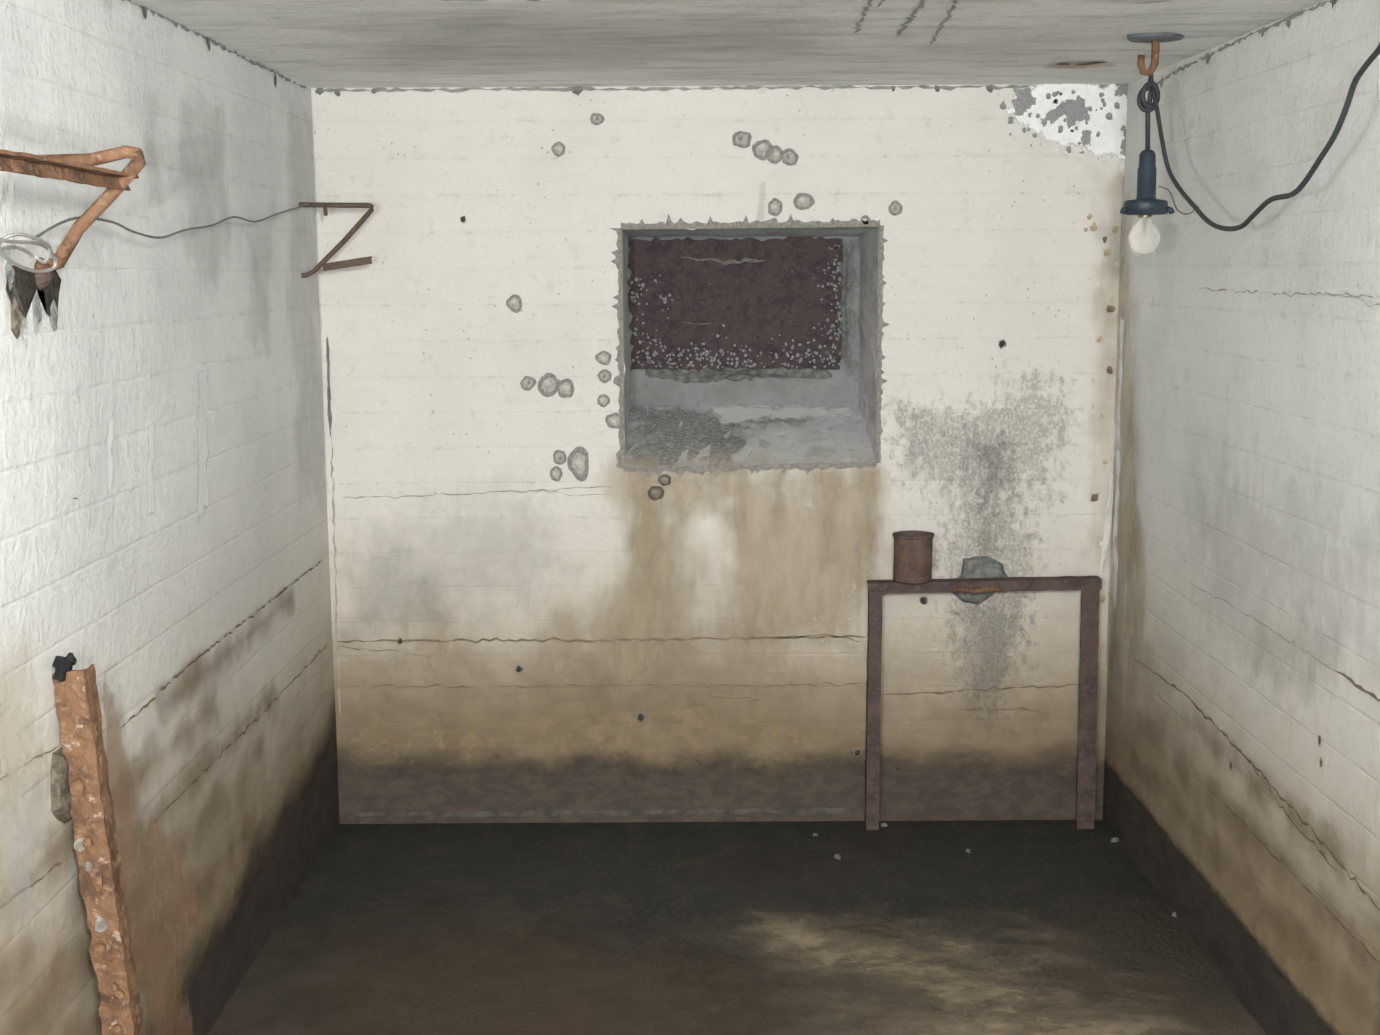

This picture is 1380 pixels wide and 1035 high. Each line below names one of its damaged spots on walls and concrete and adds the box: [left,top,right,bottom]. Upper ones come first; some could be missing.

crack [122,0,1037,97]
peeling [1000,84,1128,171]
water stain [133,474,1078,1035]
water stain [1094,716,1368,1035]
crack [1127,653,1380,964]
crack [1191,583,1380,702]